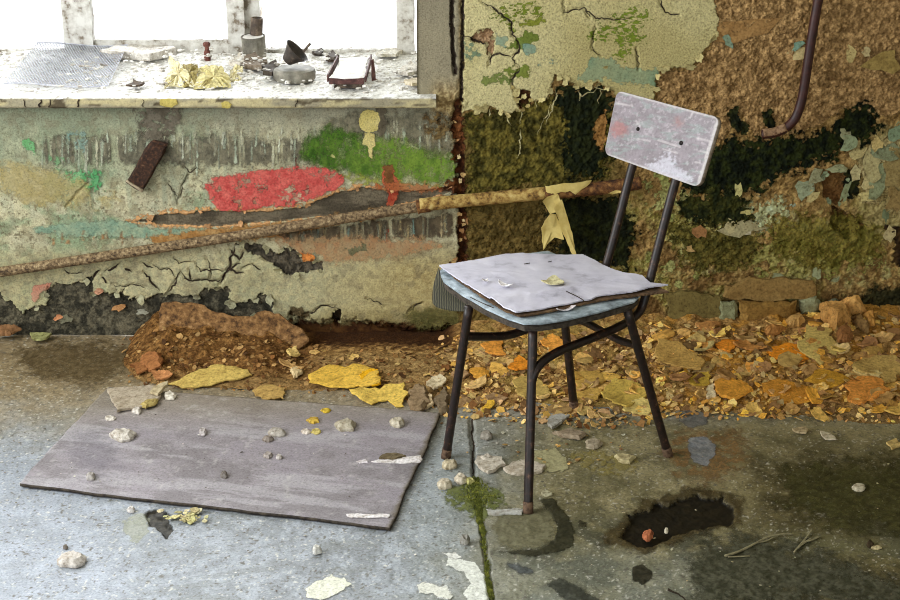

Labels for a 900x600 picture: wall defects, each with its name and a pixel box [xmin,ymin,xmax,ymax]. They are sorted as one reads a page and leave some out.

crack [564,7,628,56]
spalling [461,0,900,254]
damp [42,134,151,172]
damp [157,128,313,176]
damp [643,99,900,289]
crack [65,247,260,293]
spalling [235,241,323,280]
peeling [812,267,839,282]
spalling [0,276,274,341]
crack [470,419,478,498]
spalling [603,486,745,555]